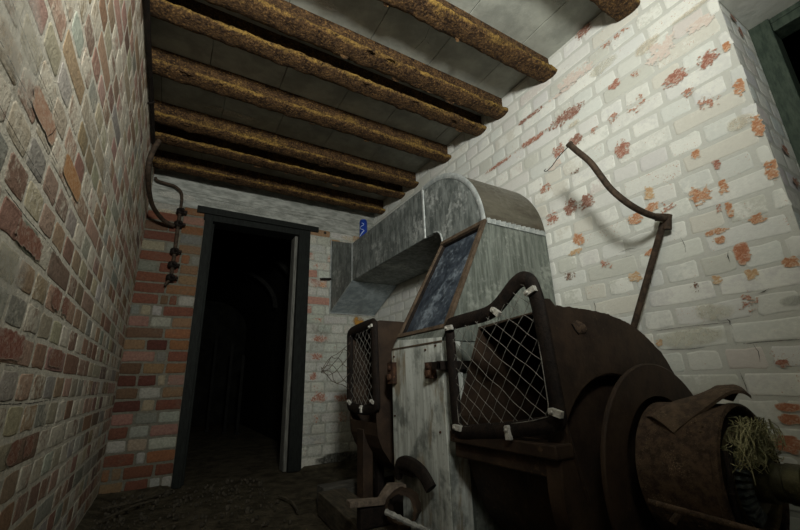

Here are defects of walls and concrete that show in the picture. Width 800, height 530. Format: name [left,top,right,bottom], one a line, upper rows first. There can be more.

peeling [518,59,595,126]
peeling [662,41,731,110]
peeling [732,78,745,96]
peeling [485,100,585,174]
peeling [614,139,630,158]
peeling [750,114,765,136]
peeling [763,159,780,181]
peeling [546,193,595,225]
peeling [688,179,734,218]
peeling [732,242,759,280]
peeling [775,402,800,425]